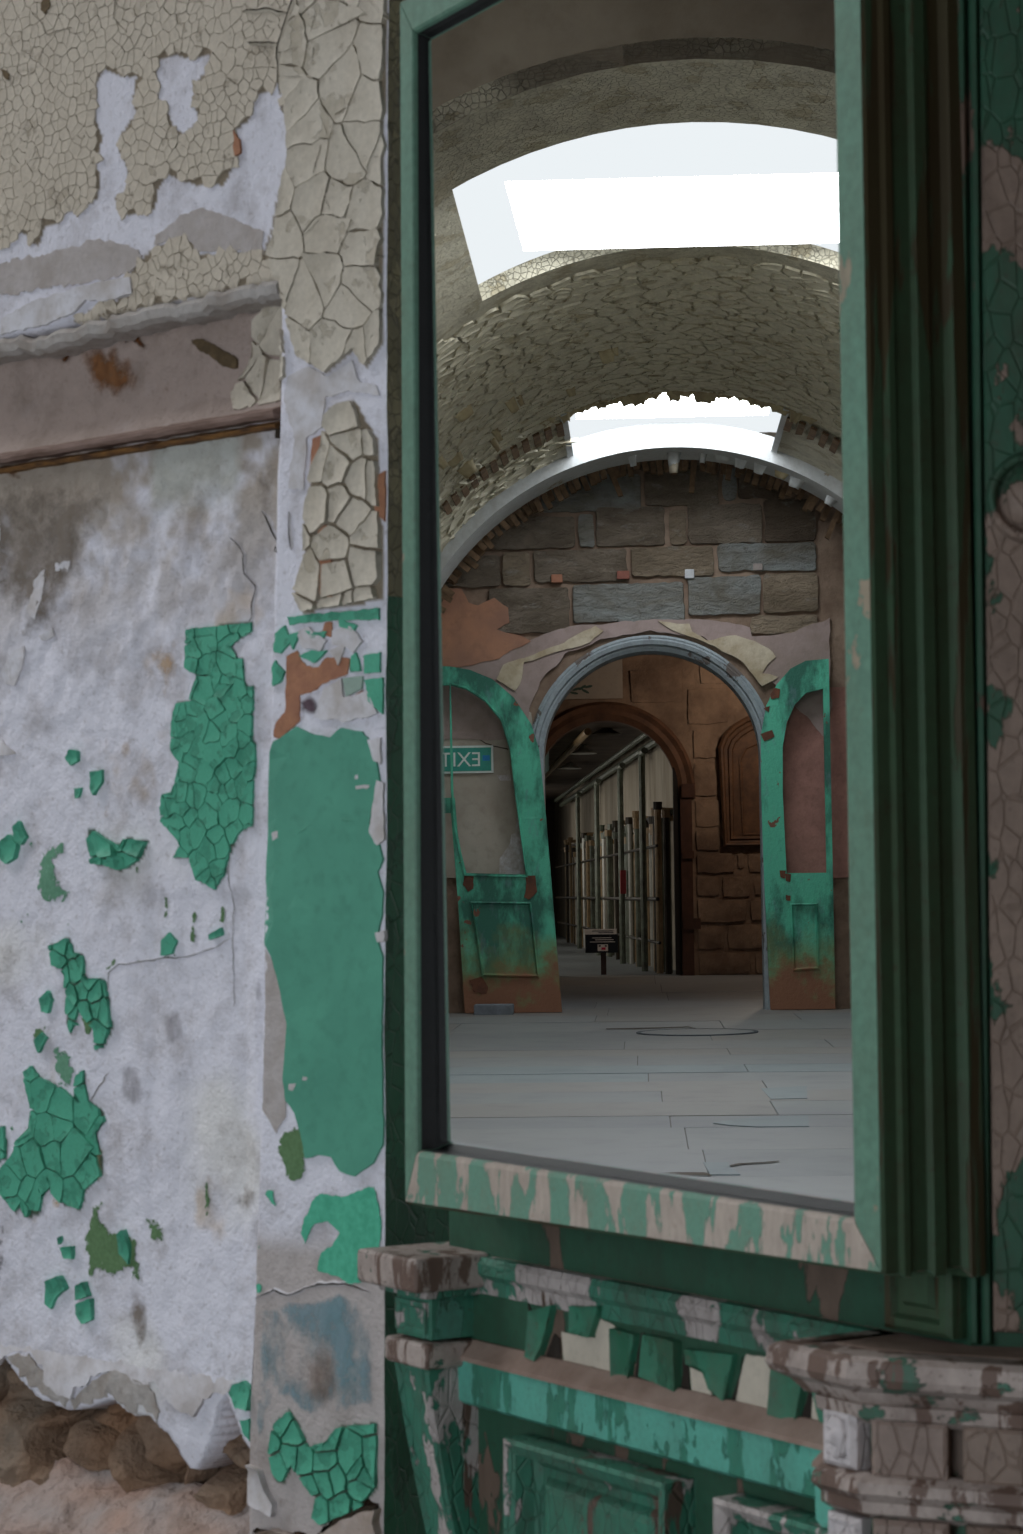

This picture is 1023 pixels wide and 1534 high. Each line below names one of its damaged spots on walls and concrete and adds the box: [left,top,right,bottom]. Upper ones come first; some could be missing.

crack [32,13,72,36]
crack [242,0,390,294]
peeling [0,0,387,890]
peeling [39,938,113,1050]
peeling [160,932,179,956]
peeling [208,928,224,940]
flaking render [262,949,307,1133]
peeling [0,1032,106,1218]
peeling [44,1236,95,1324]
peeling [116,1229,132,1264]
peeling [301,1187,381,1284]
flaking render [0,1343,382,1534]